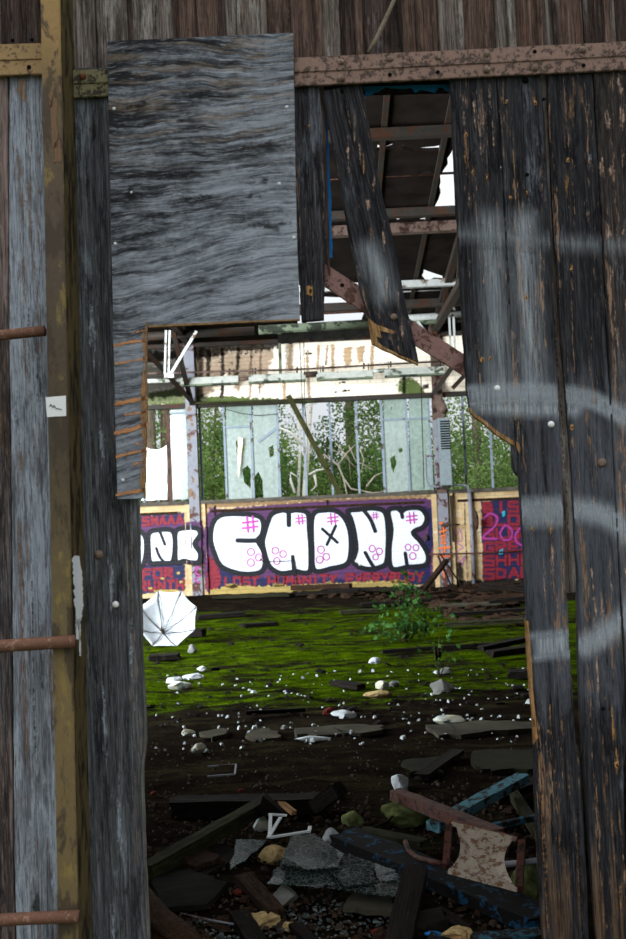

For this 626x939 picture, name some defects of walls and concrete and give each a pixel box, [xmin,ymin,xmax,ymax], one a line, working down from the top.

peeling [49,84,62,162]